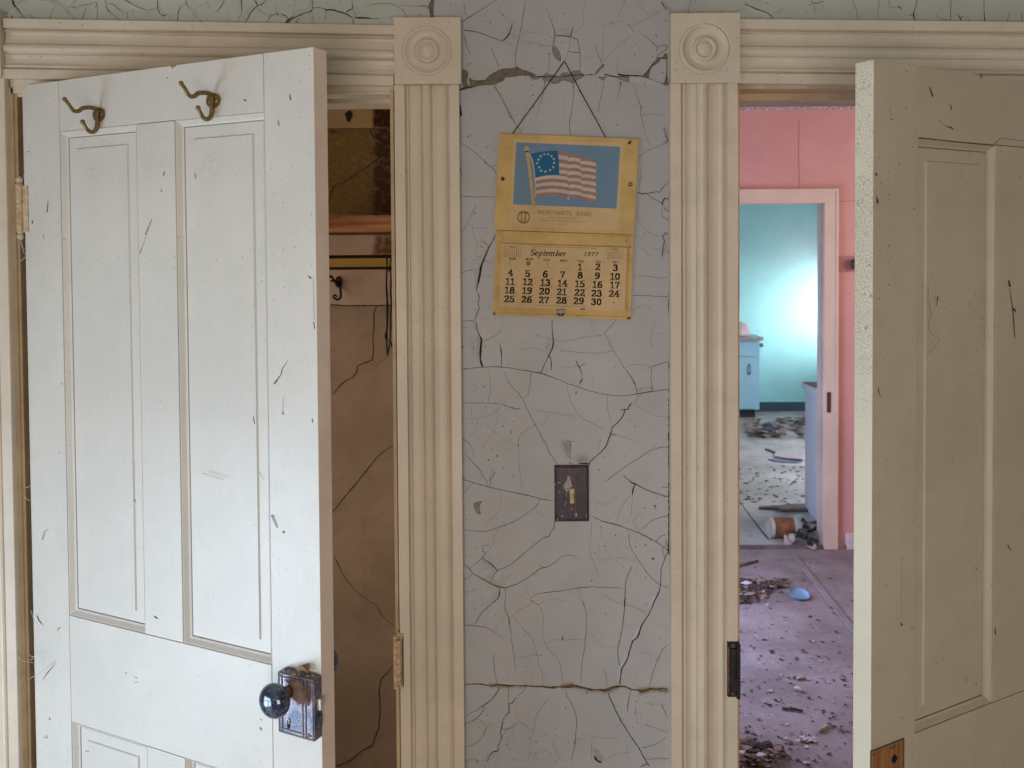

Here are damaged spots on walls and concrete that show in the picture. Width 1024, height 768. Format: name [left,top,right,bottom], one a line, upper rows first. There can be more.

crack [6,0,433,24]
crack [721,4,783,19]
crack [853,1,1022,21]
spalling [462,46,629,90]
crack [332,306,385,395]
crack [460,0,691,767]
crack [333,446,392,511]
crack [337,666,393,766]